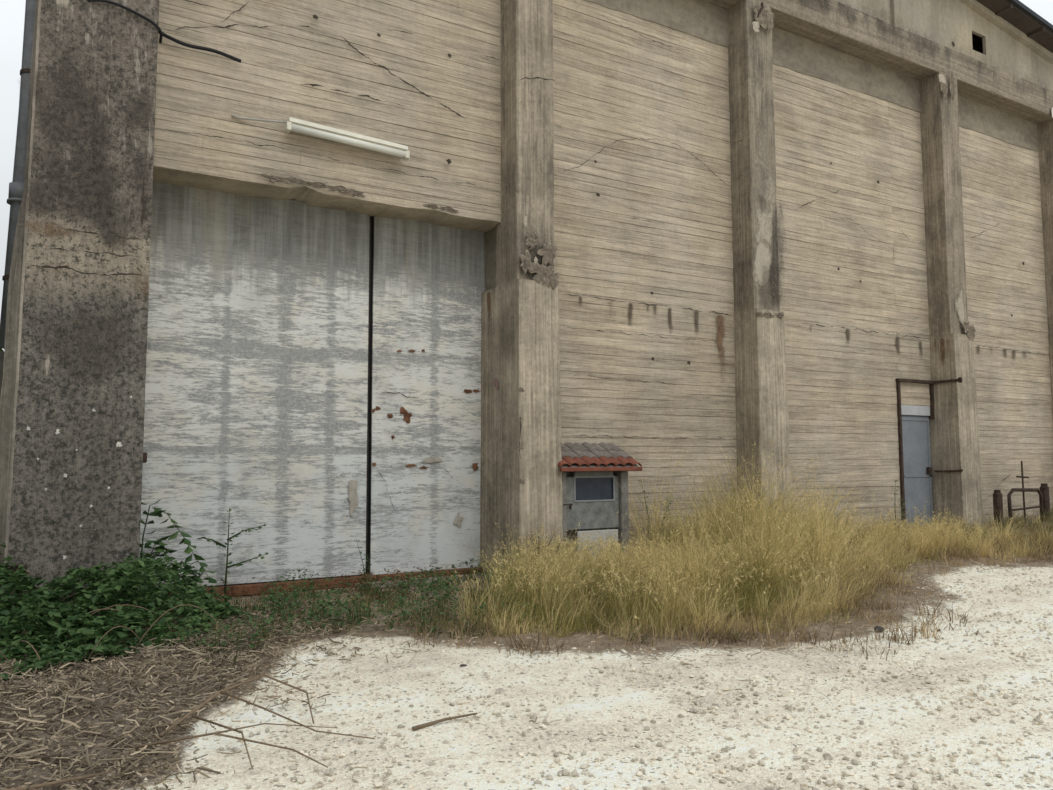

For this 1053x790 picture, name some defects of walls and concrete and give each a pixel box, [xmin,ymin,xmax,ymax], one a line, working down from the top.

crack [173,0,314,31]
spalling [752,1,774,32]
crack [303,35,466,119]
spalling [260,172,366,198]
crack [31,176,146,276]
spalling [519,215,559,290]